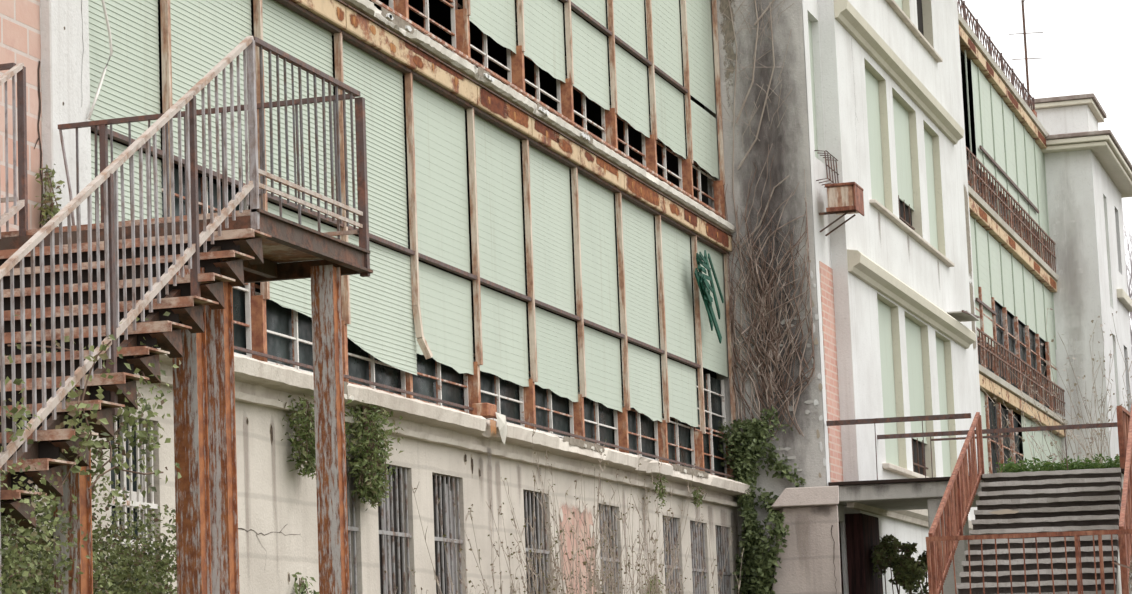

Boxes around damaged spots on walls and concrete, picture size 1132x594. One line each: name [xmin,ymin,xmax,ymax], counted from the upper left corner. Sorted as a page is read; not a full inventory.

rust [337,7,376,35]
rust [390,41,464,87]
water stain [720,0,736,98]
rust [480,88,729,247]
peeling [559,505,596,594]